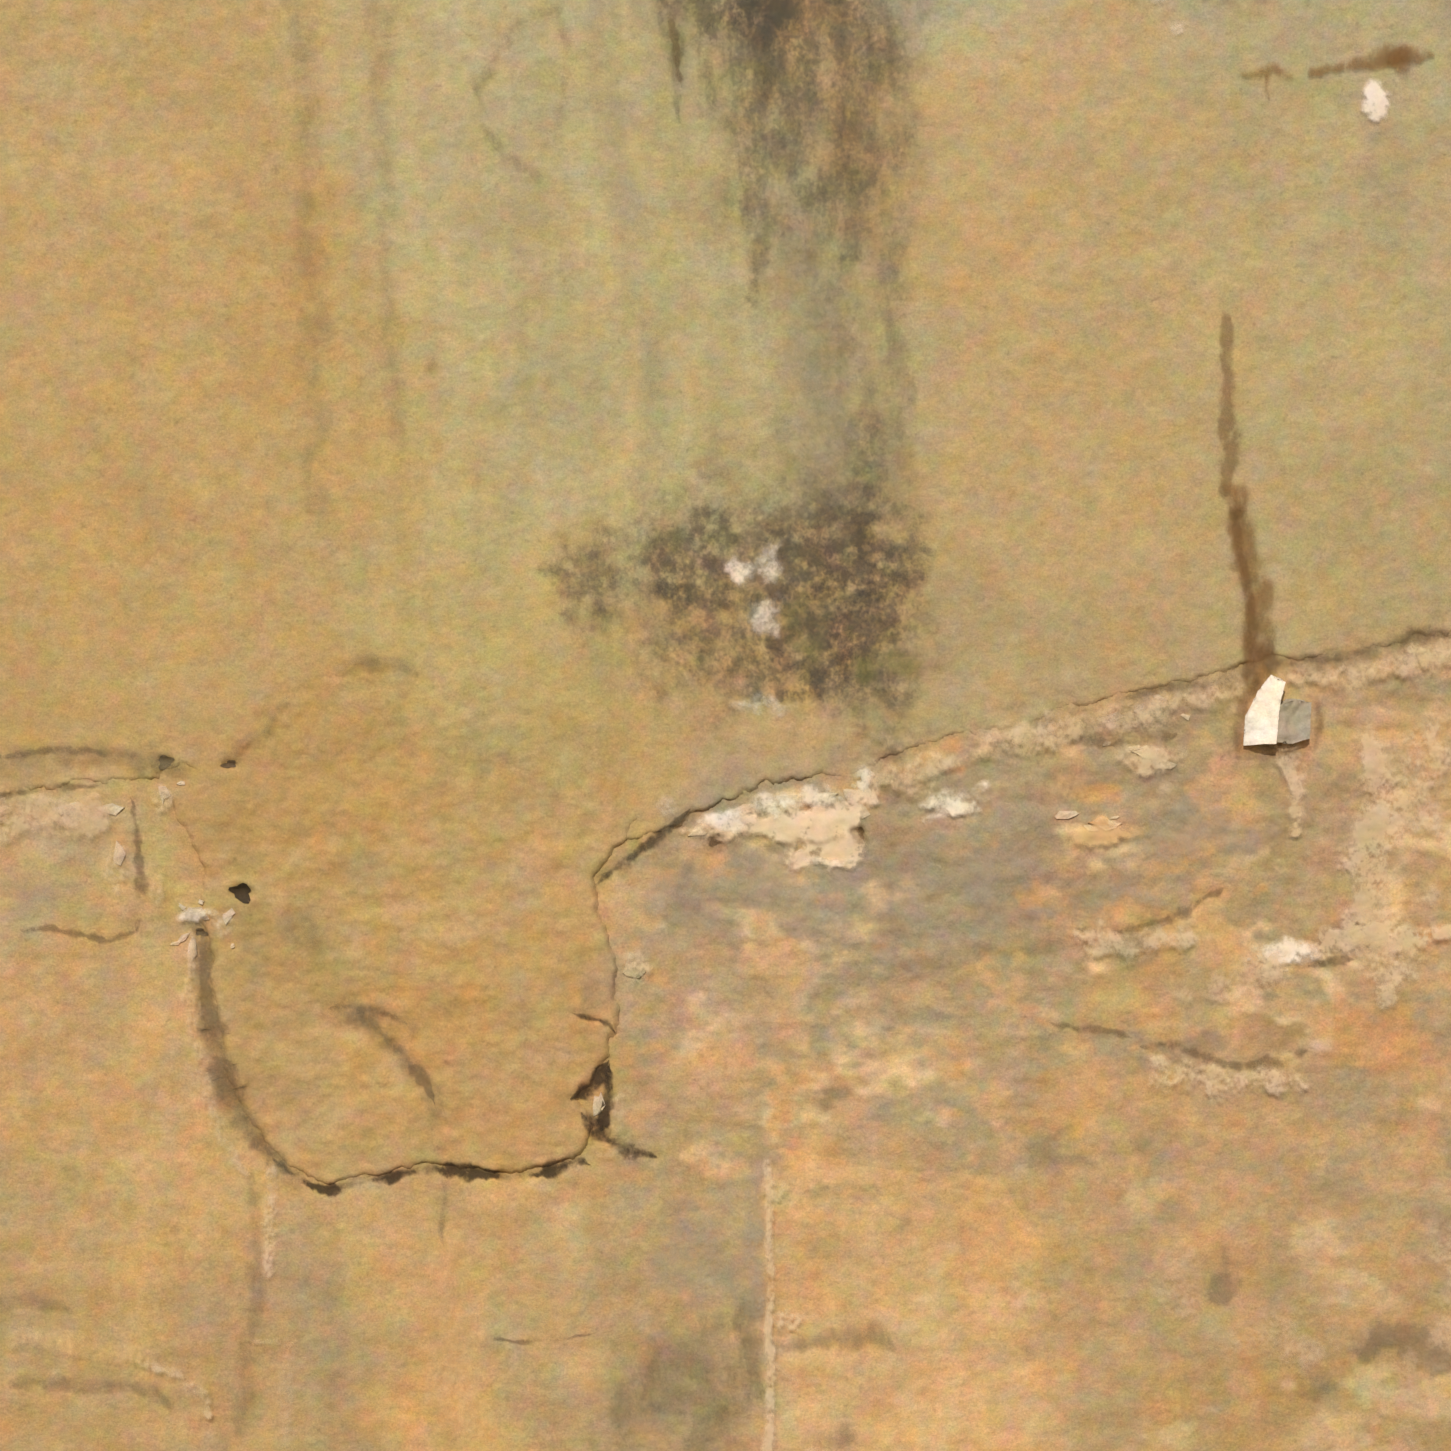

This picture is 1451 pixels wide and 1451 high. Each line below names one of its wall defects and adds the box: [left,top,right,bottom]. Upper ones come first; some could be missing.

corrosion [1362,80,1389,121]
leakage [726,561,777,584]
leakage [755,602,773,630]
crack [600,809,690,881]
peeling [0,632,1451,1451]
crack [272,1013,656,1196]